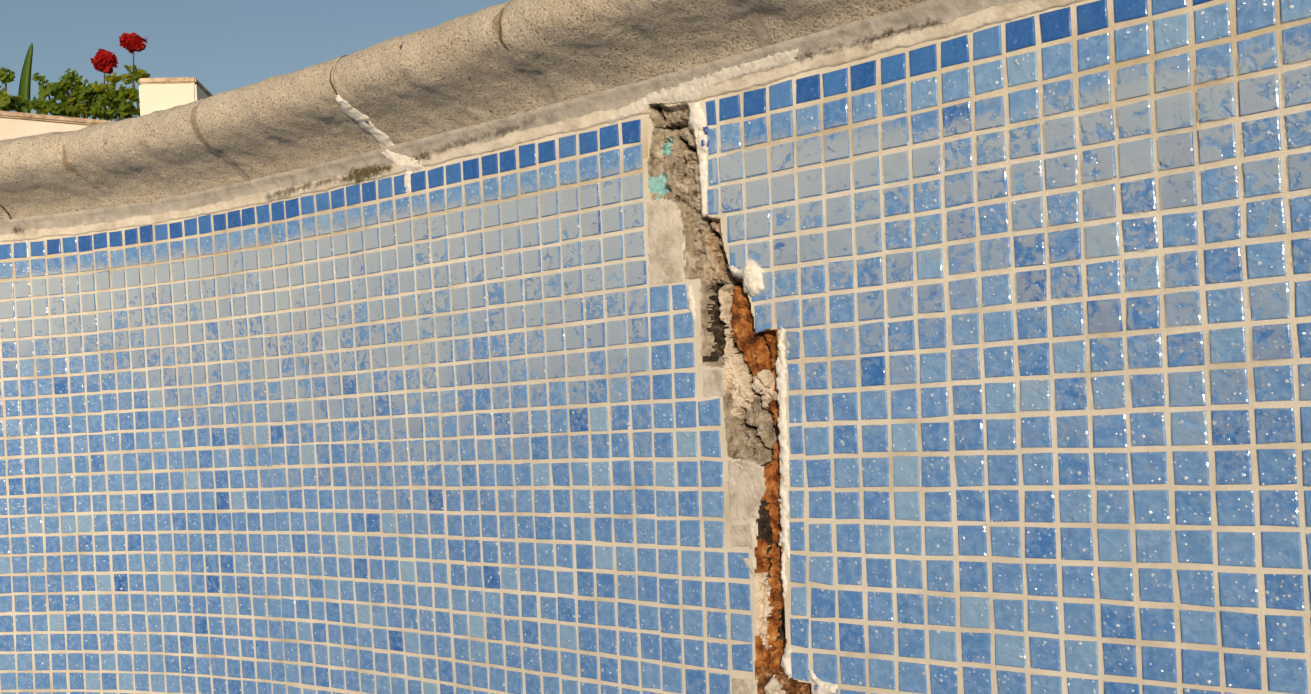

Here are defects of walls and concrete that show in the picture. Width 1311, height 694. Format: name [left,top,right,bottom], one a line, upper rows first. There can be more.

crack [499,8,557,104]
crack [329,67,424,172]
spalling [698,126,710,152]
peeling [646,198,686,286]
peeling [727,458,766,577]
peeling [731,678,758,694]